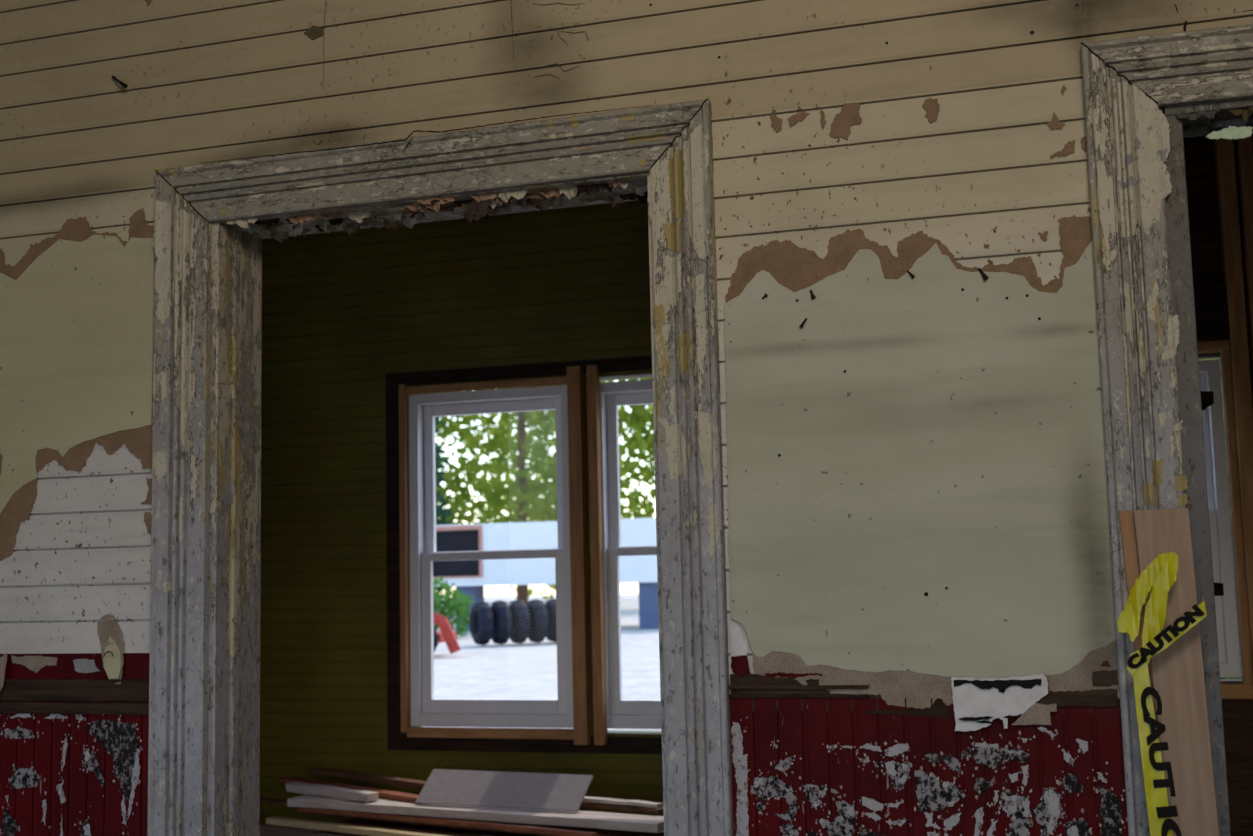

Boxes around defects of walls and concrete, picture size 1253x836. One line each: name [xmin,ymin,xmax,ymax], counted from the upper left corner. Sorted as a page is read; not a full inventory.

crack [511,0,589,79]
peeling [1116,33,1253,73]
crack [199,105,652,164]
peeling [1106,75,1253,243]
peeling [220,113,719,560]
peeling [0,713,143,836]
peeling [731,717,1127,836]